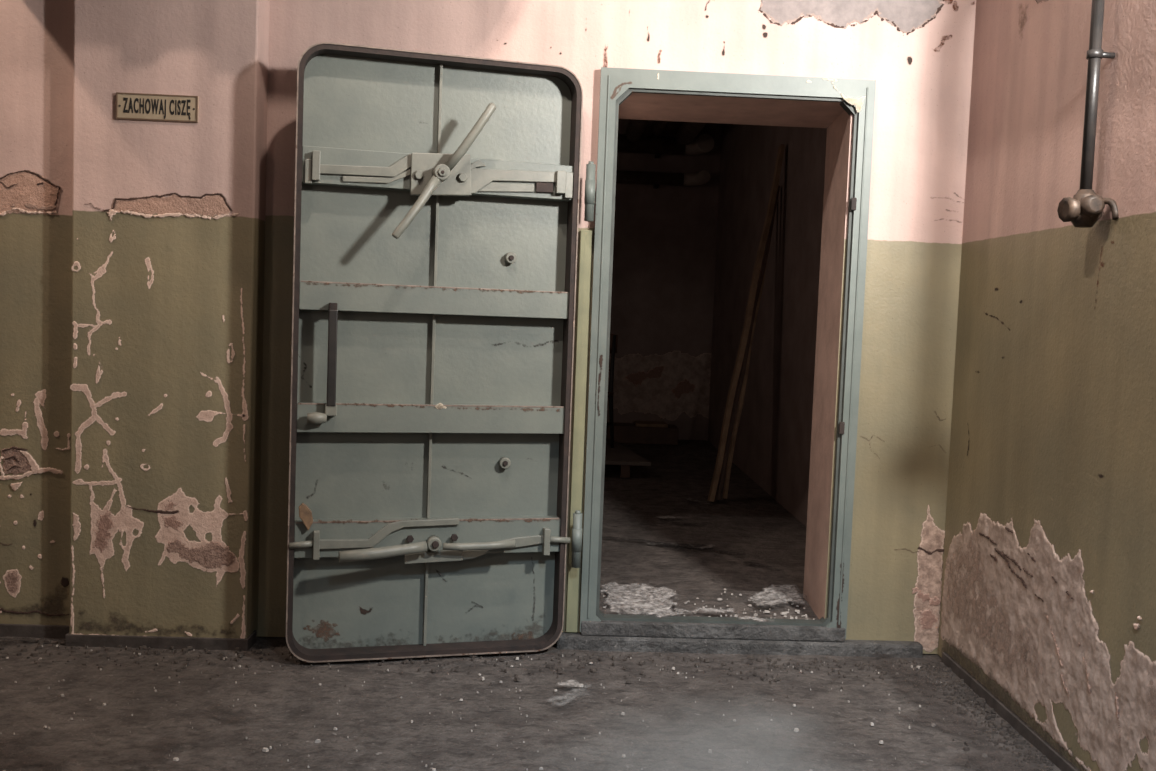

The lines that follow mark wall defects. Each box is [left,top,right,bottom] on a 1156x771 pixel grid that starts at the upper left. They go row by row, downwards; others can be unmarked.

spalling [759,0,944,36]
spalling [0,170,61,216]
peeling [0,193,248,639]
peeling [912,505,1156,771]